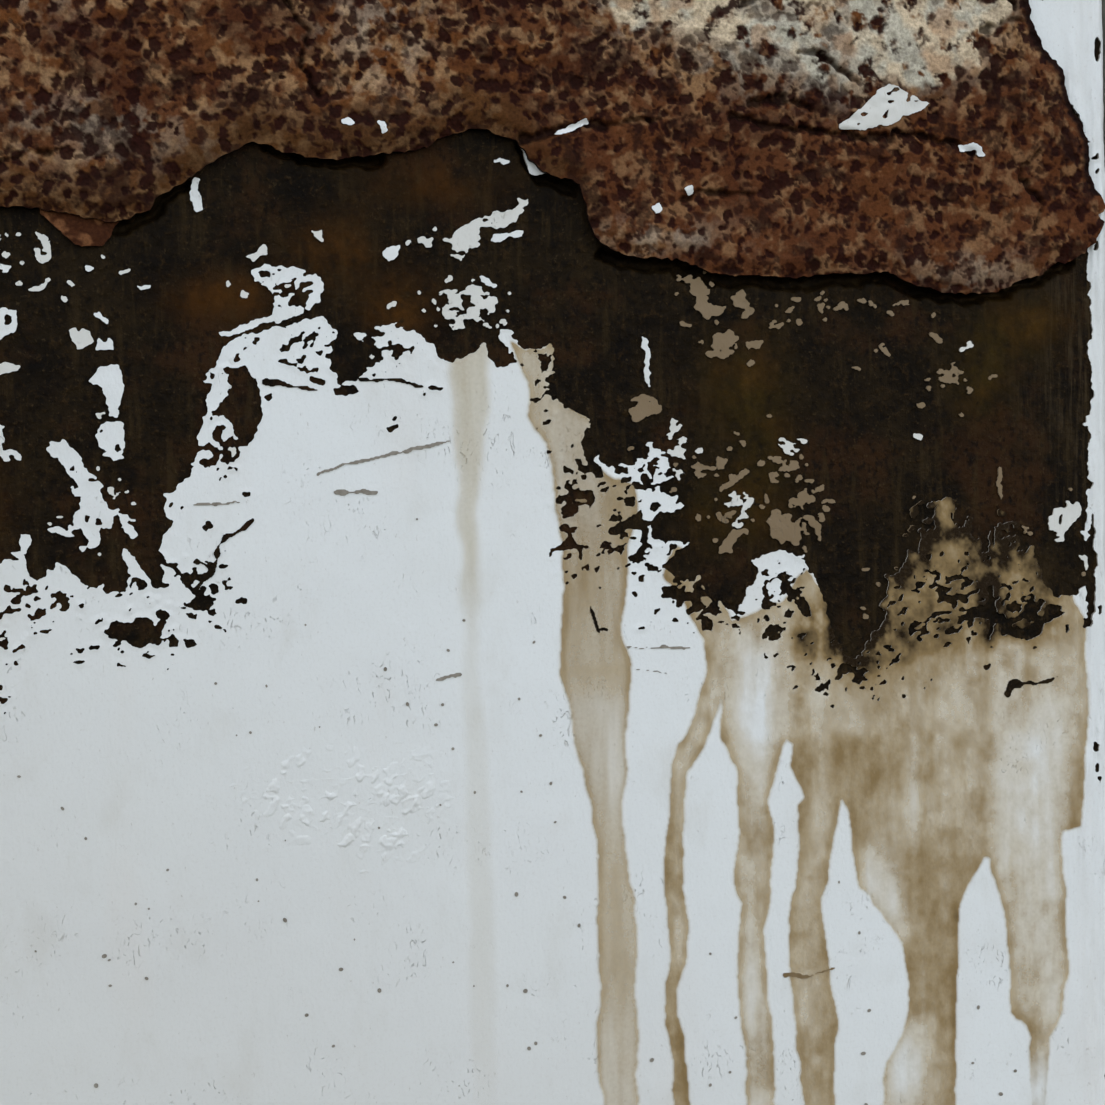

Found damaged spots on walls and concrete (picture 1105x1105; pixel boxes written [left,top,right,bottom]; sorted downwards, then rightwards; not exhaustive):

rust [0,0,1105,295]
spalling [1094,37,1102,61]
peeling [0,129,1101,708]